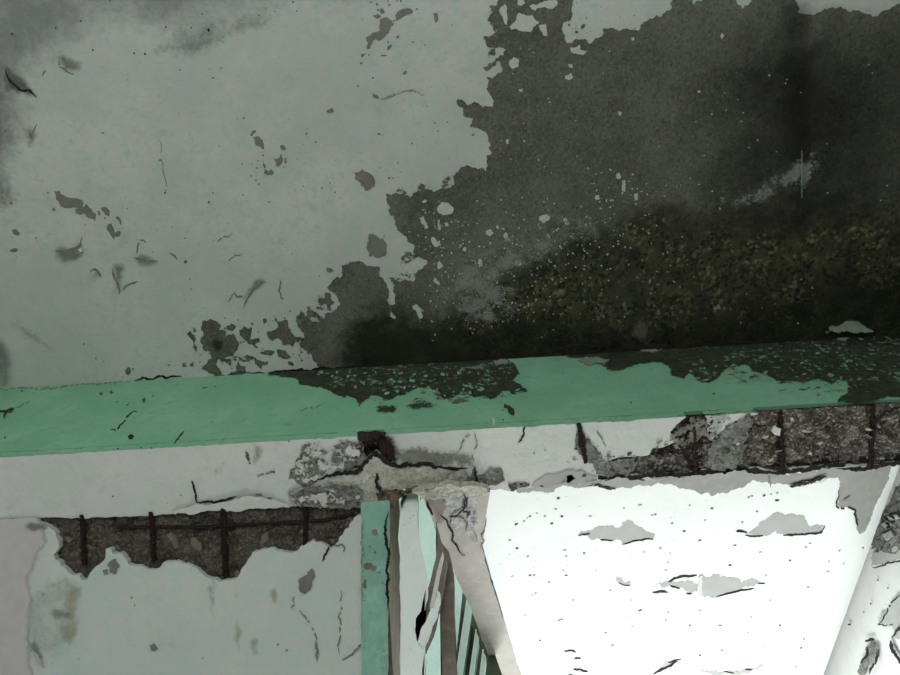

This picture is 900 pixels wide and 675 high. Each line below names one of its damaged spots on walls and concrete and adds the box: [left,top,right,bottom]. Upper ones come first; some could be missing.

water stain [740,61,882,229]
peeling [47,191,122,239]
peeling [182,0,900,376]
water stain [268,216,900,415]
rust [354,436,397,462]
rust [650,413,754,473]
crack [426,502,487,556]
spalling [40,402,900,580]
peeling [578,520,767,599]
spalling [857,627,900,675]